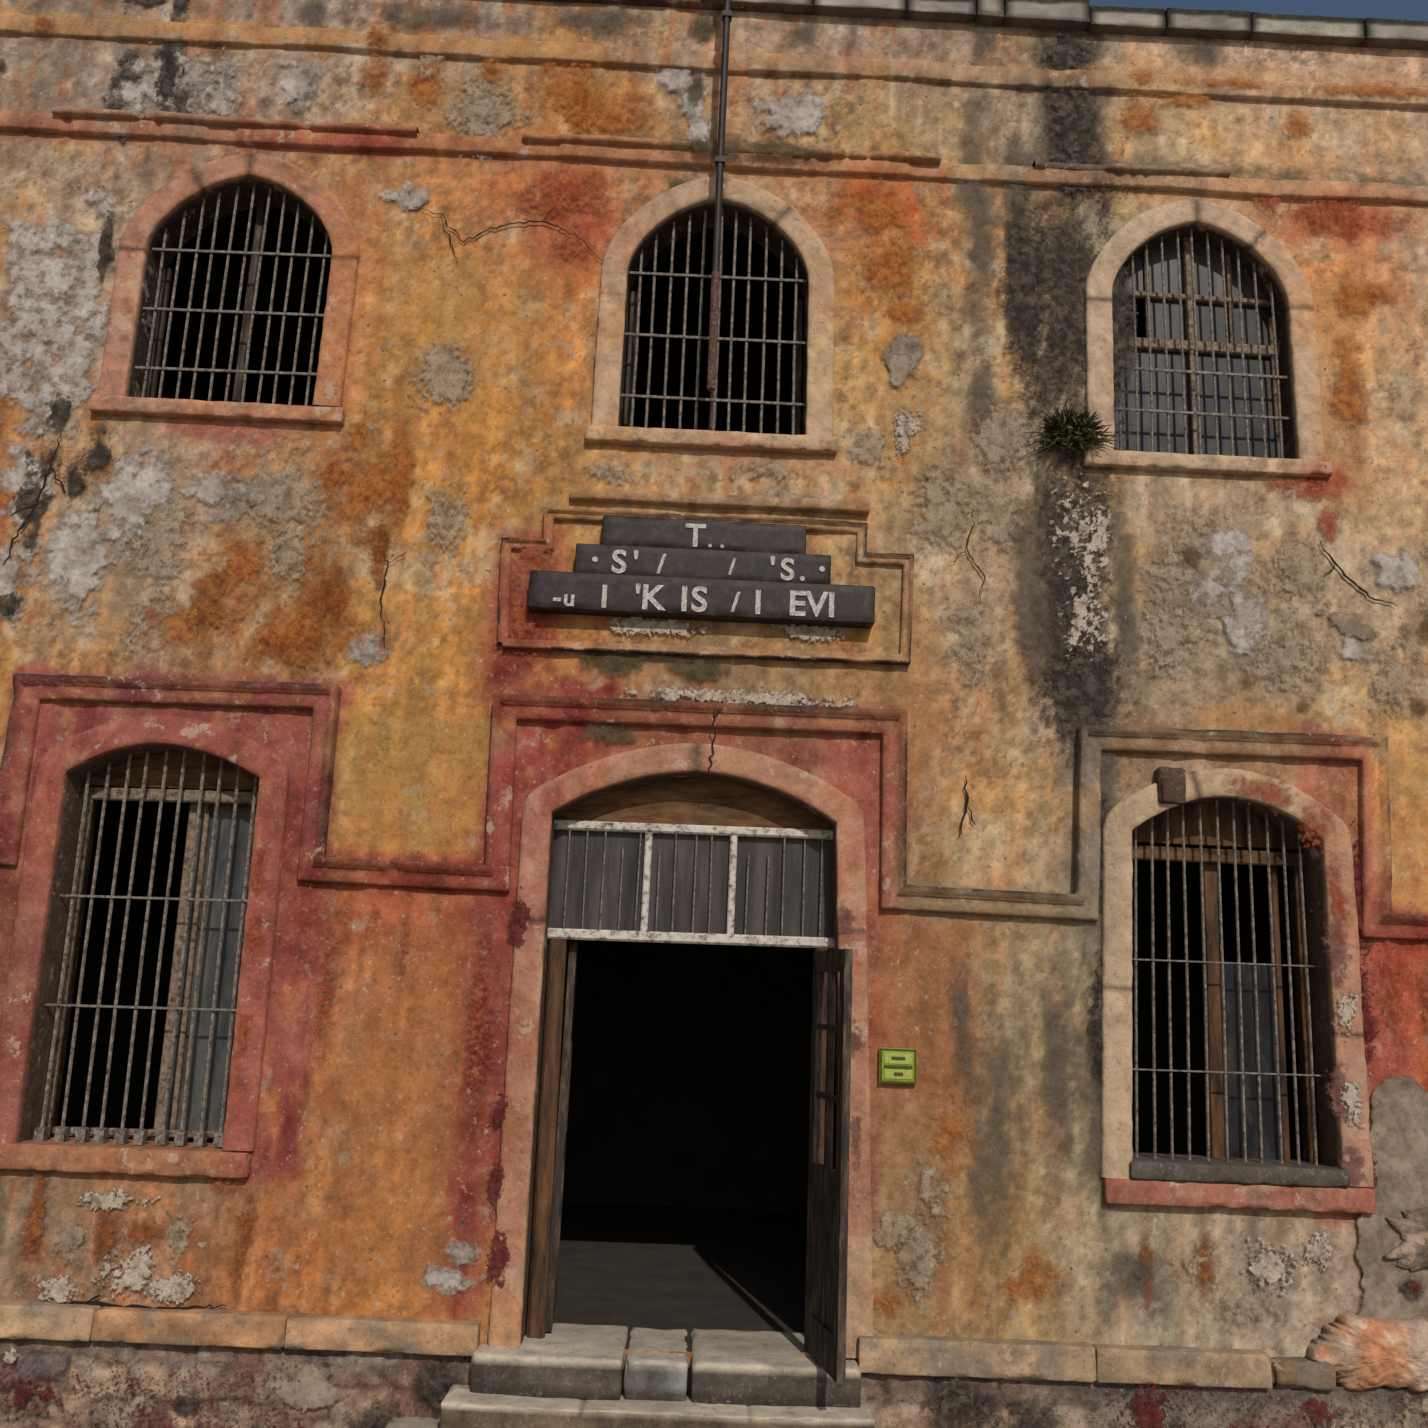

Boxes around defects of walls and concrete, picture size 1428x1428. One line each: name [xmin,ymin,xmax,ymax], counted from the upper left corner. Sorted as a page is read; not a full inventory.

peeling [657,67,714,141]
damp [1040,29,1106,71]
crack [412,203,602,262]
damp [958,88,1155,451]
peeling [0,180,342,657]
damp [1010,449,1138,765]
peeling [841,391,1428,728]
crack [1320,541,1398,606]
crack [708,711,719,774]
crack [958,776,976,837]
peeling [21,1186,204,1305]
spalling [1327,1064,1428,1322]